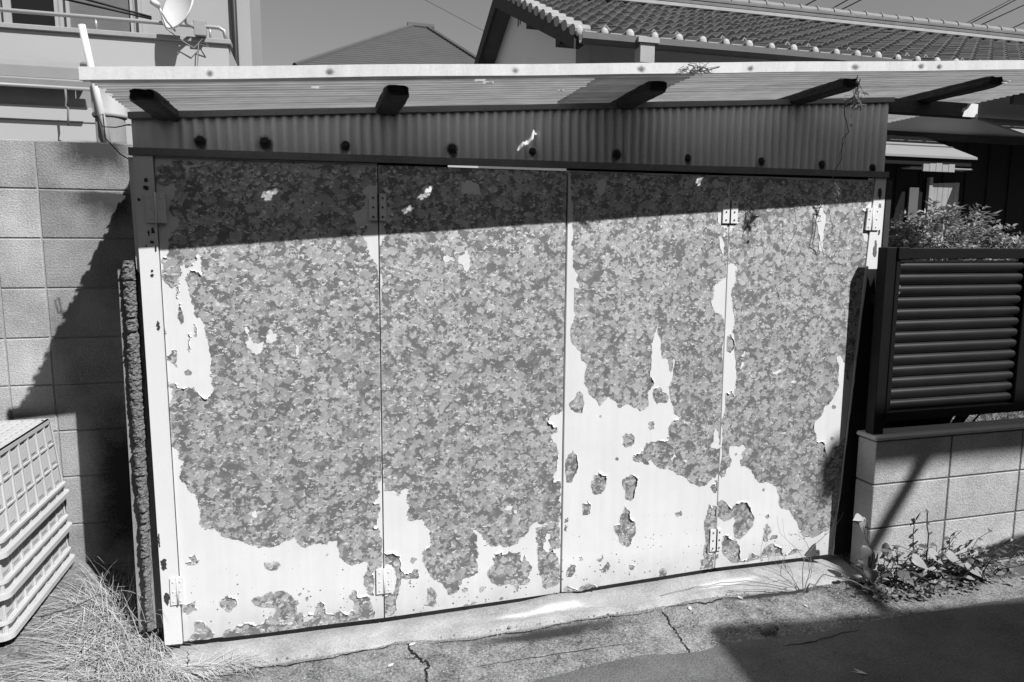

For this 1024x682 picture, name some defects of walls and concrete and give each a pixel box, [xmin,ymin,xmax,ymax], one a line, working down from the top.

crack [187,592,786,682]
peeling [155,160,874,642]